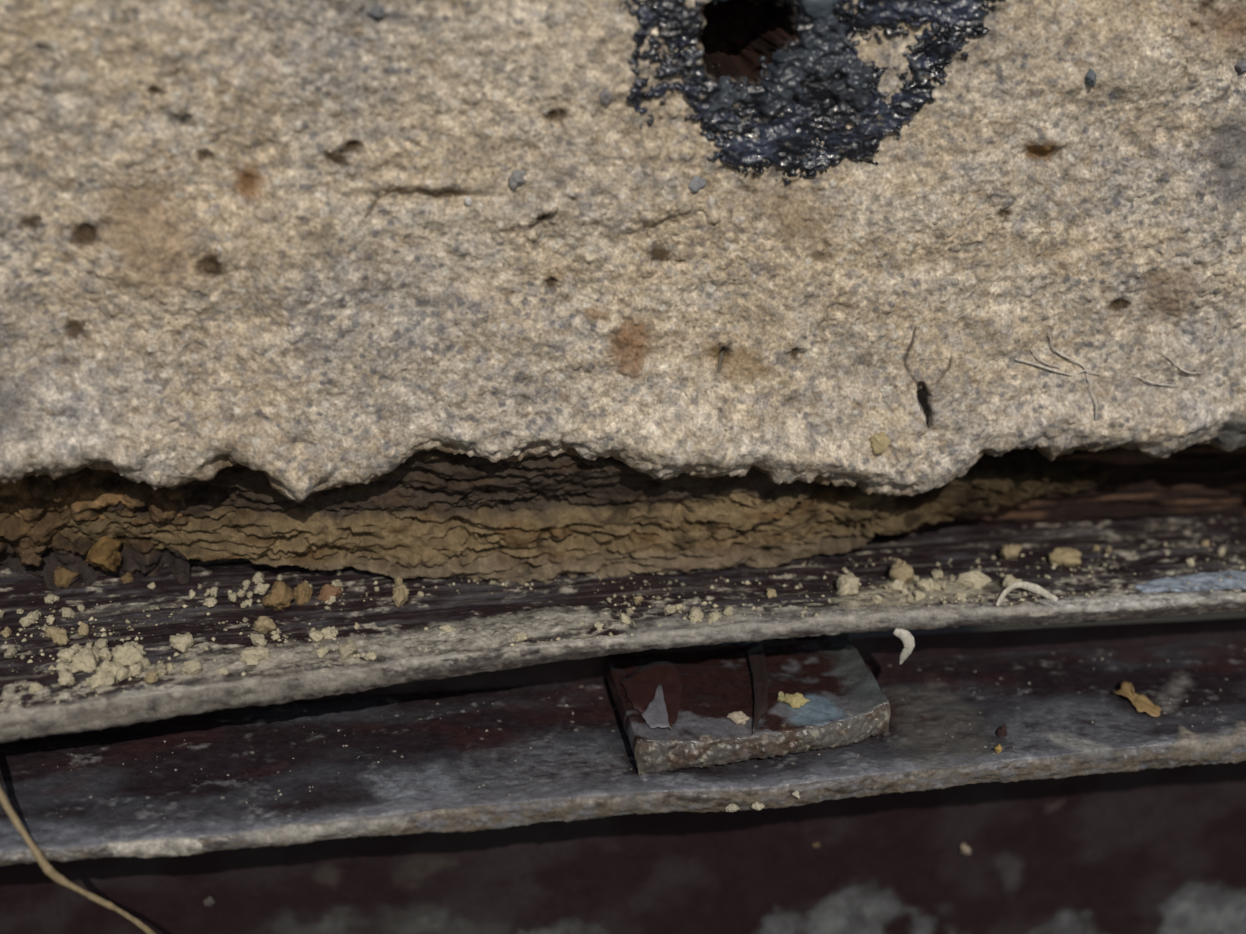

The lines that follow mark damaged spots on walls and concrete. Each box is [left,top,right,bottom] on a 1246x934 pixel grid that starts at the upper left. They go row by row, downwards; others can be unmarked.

spalling [0,467,190,594]
spalling [901,444,1246,534]
water stain [762,891,898,934]
water stain [1162,886,1246,934]